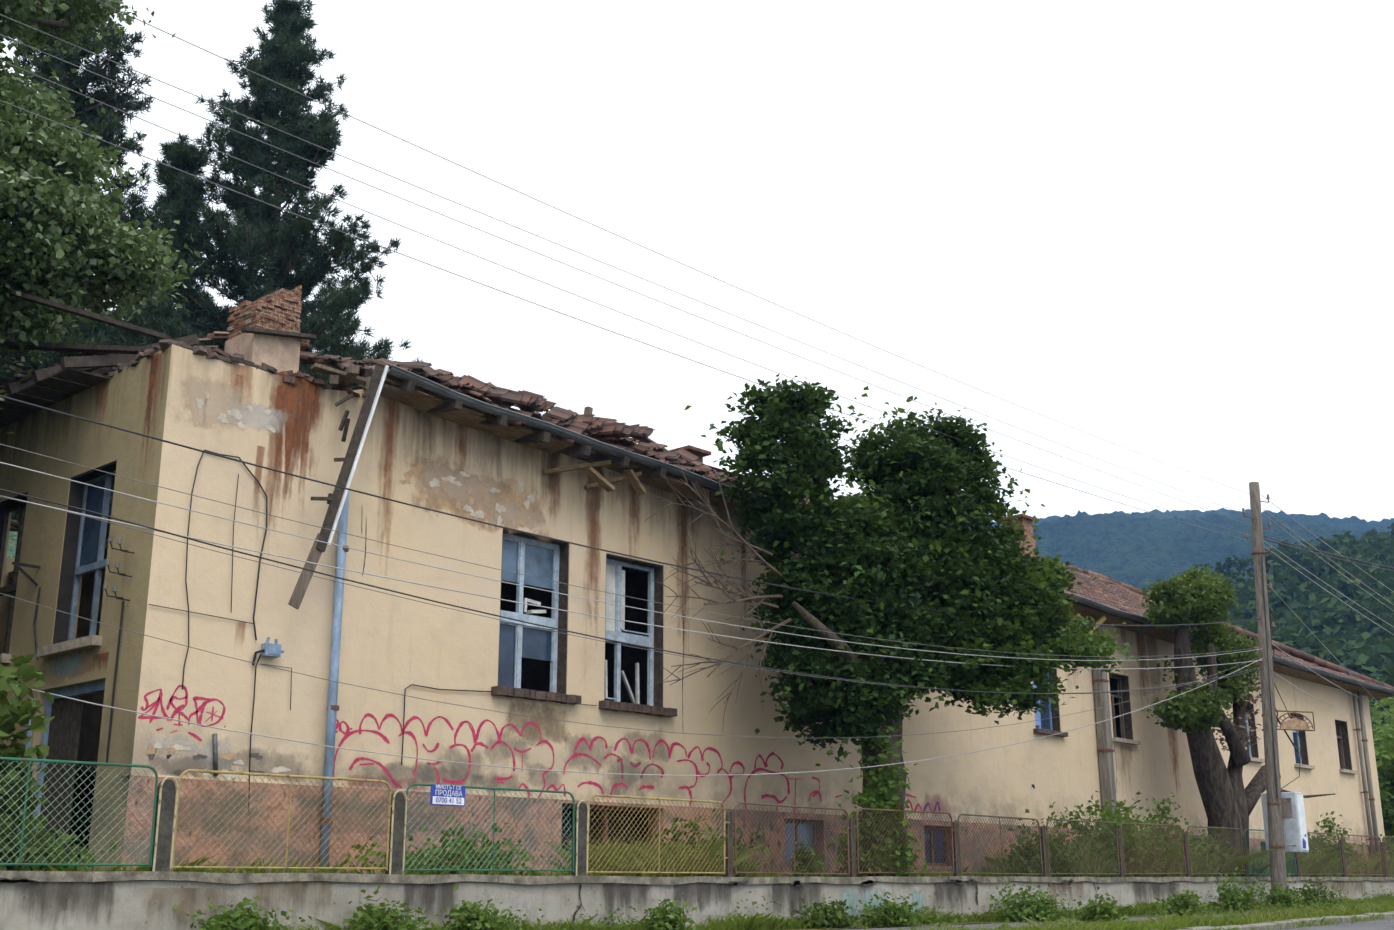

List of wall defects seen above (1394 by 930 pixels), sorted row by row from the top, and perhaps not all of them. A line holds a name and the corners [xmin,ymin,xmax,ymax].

peeling [188,382,278,433]
rust [255,371,321,511]
peeling [400,461,541,528]